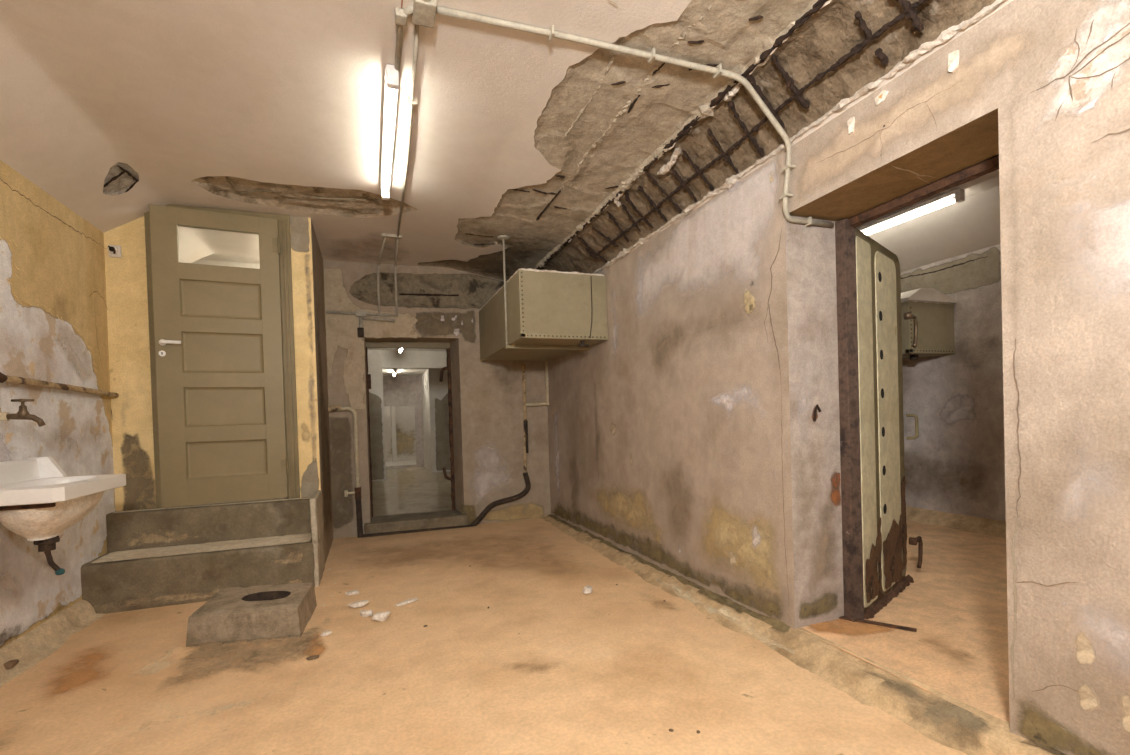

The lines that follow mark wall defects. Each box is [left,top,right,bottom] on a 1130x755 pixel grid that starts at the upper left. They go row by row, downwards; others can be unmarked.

spalling [531,0,1006,274]
crack [1030,19,1130,120]
flaking render [1051,0,1130,114]
peeling [0,236,114,478]
peeling [0,489,116,639]
leakage [461,415,837,632]
corrosion [810,473,914,635]